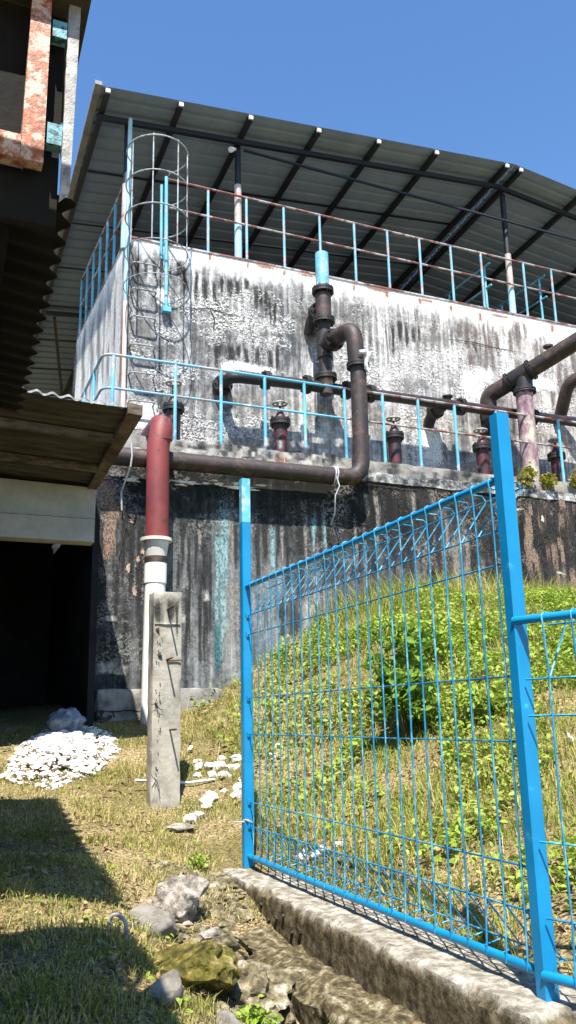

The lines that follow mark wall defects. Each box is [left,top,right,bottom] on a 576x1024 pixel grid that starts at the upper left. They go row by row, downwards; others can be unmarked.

leakage [189,390,217,421]
leakage [169,261,301,368]
leakage [295,404,320,431]
leakage [334,302,543,392]
leakage [544,353,576,406]
leakage [114,487,240,673]
leakage [254,493,330,637]
leakage [354,494,414,579]
leakage [399,486,497,591]
leakage [526,492,576,591]